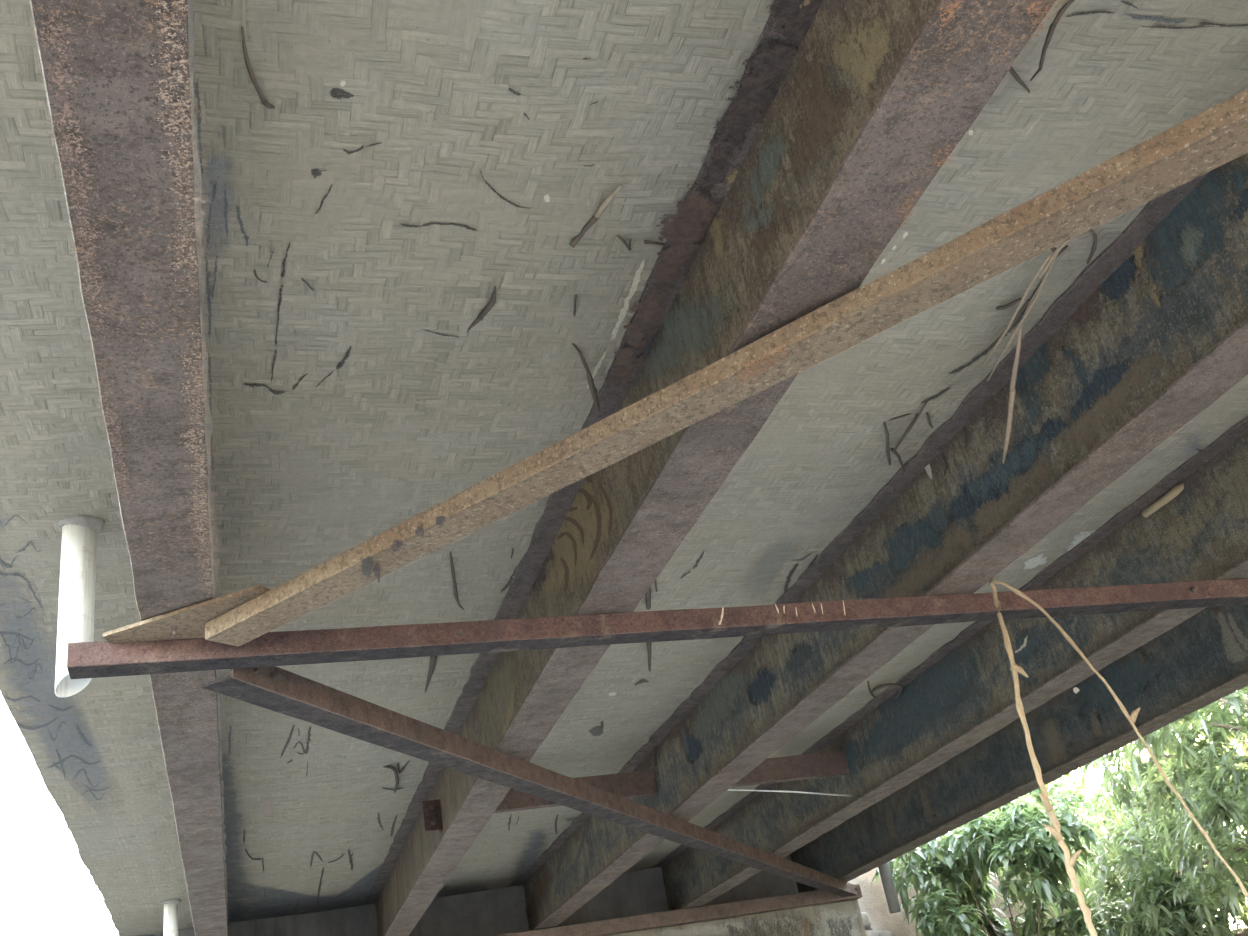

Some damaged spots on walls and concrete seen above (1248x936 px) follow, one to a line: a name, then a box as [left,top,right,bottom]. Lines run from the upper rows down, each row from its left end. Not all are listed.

peeling [830,14,892,98]
corrosion [938,0,960,27]
leakage [1099,160,1248,307]
peeling [587,260,645,388]
leakage [844,337,1129,594]
crack [0,515,110,800]